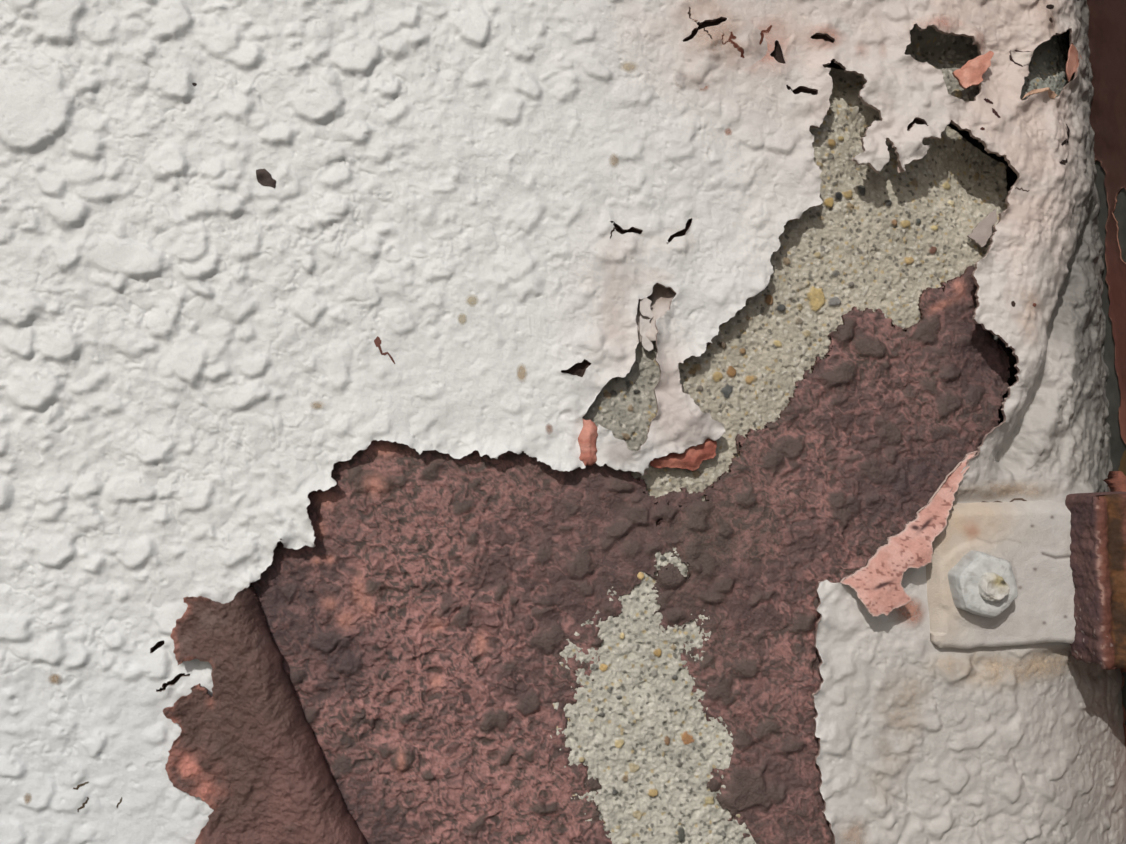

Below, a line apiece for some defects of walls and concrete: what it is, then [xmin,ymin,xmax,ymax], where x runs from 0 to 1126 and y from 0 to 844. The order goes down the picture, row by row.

peeling [905,25,994,102]
peeling [1010,4,1082,100]
peeling [163,65,1010,844]